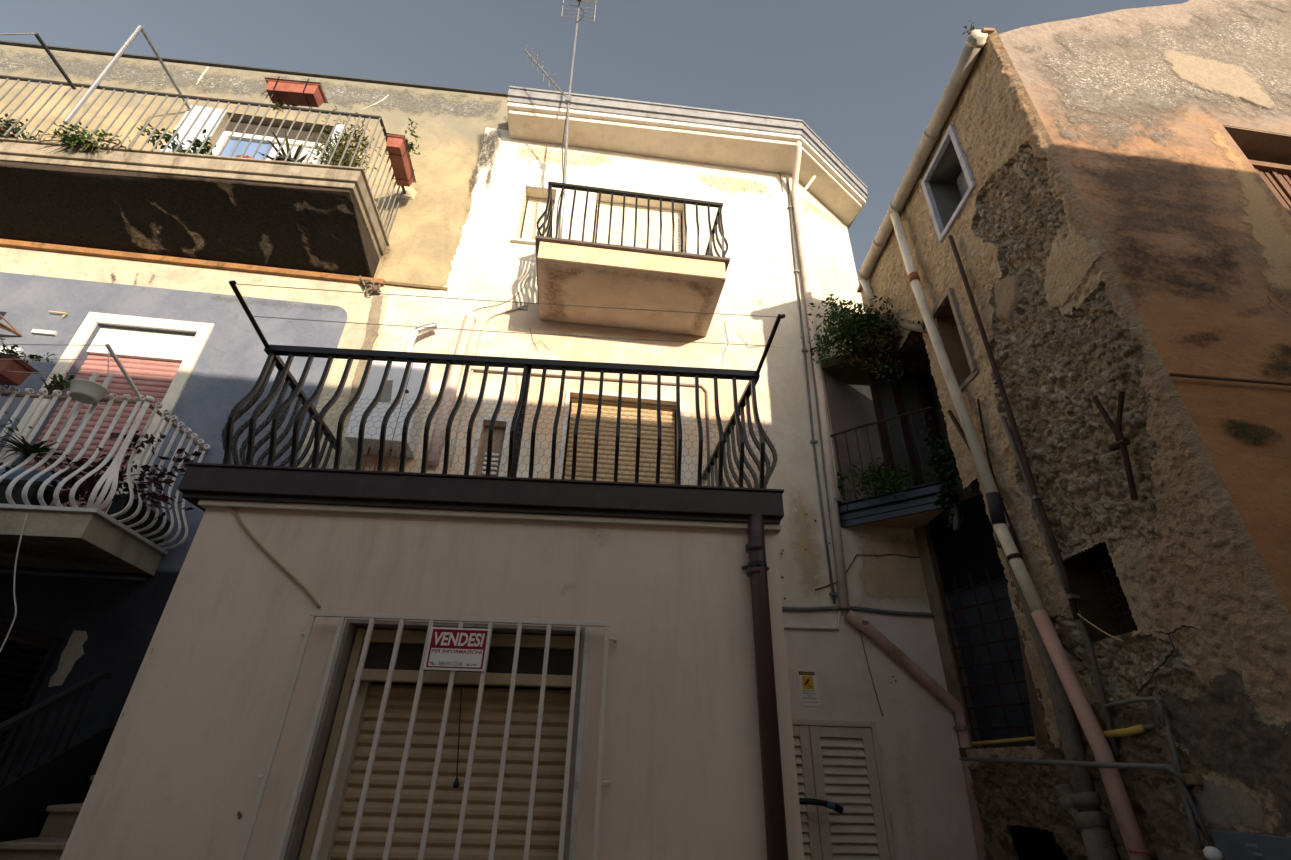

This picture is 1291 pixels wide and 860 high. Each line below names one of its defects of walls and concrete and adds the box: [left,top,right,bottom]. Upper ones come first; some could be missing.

damp [0,165,390,277]
damp [1087,157,1239,297]
spalling [970,142,1160,565]
crack [1135,625,1198,697]